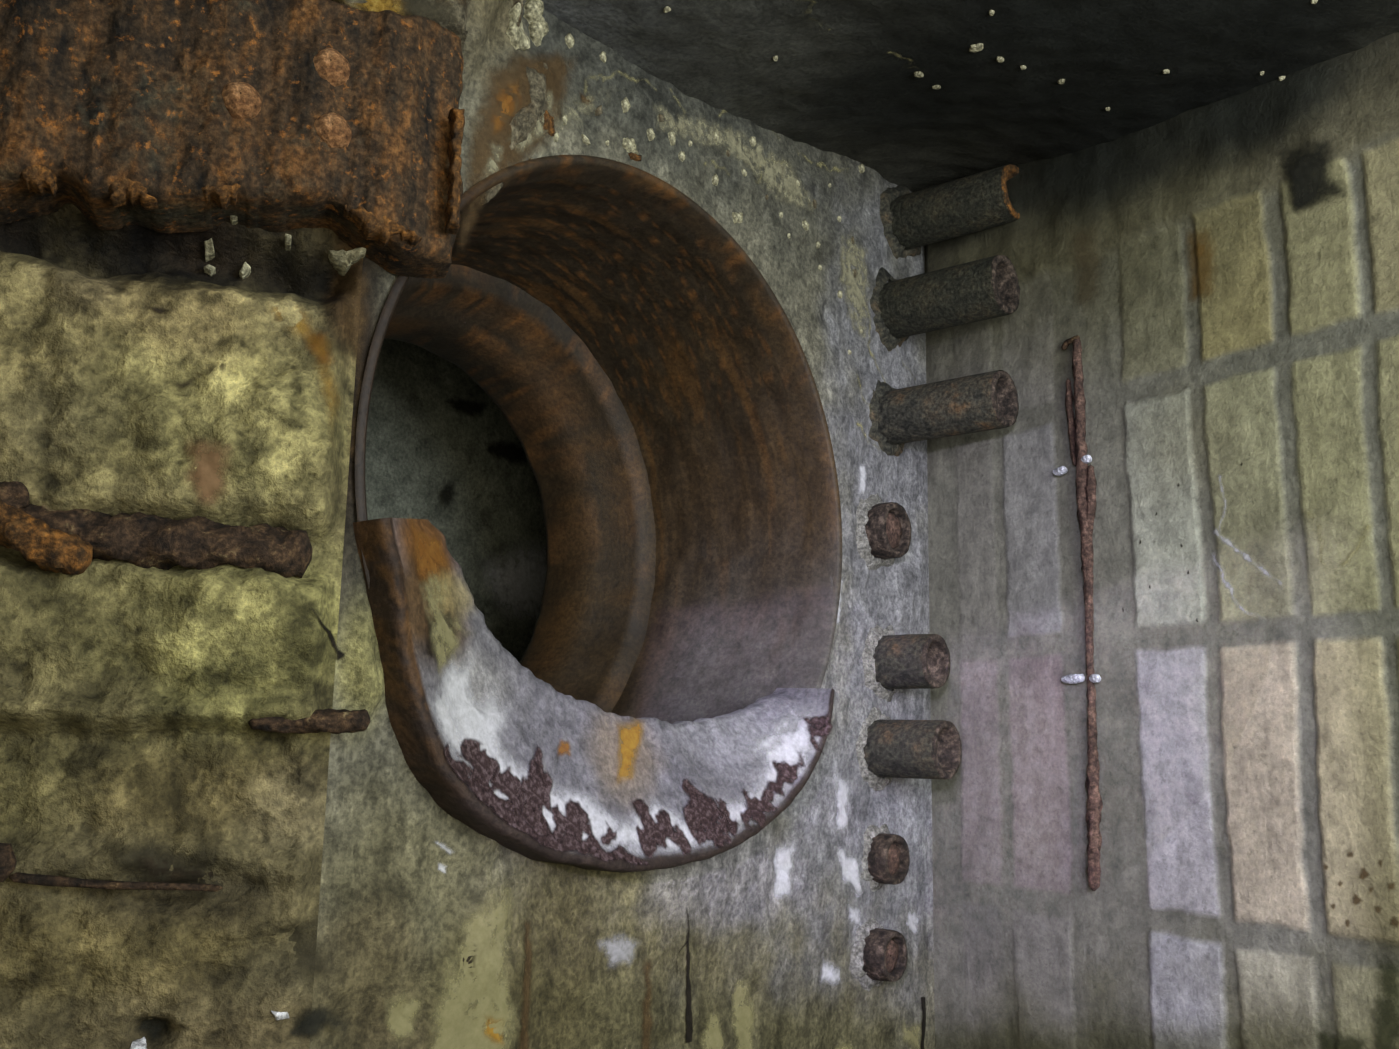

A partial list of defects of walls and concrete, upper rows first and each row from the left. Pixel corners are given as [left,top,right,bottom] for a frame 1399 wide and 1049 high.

corrosion [444,56,567,235]
corrosion [109,177,159,210]
corrosion [991,371,1019,427]
corrosion [0,481,313,578]
corrosion [880,502,912,557]
corrosion [922,634,950,688]
peeling [426,577,833,865]
corrosion [619,723,641,778]
corrosion [931,721,962,779]
corrosion [0,843,223,892]
corrosion [882,835,910,885]
damp [1319,964,1399,1049]